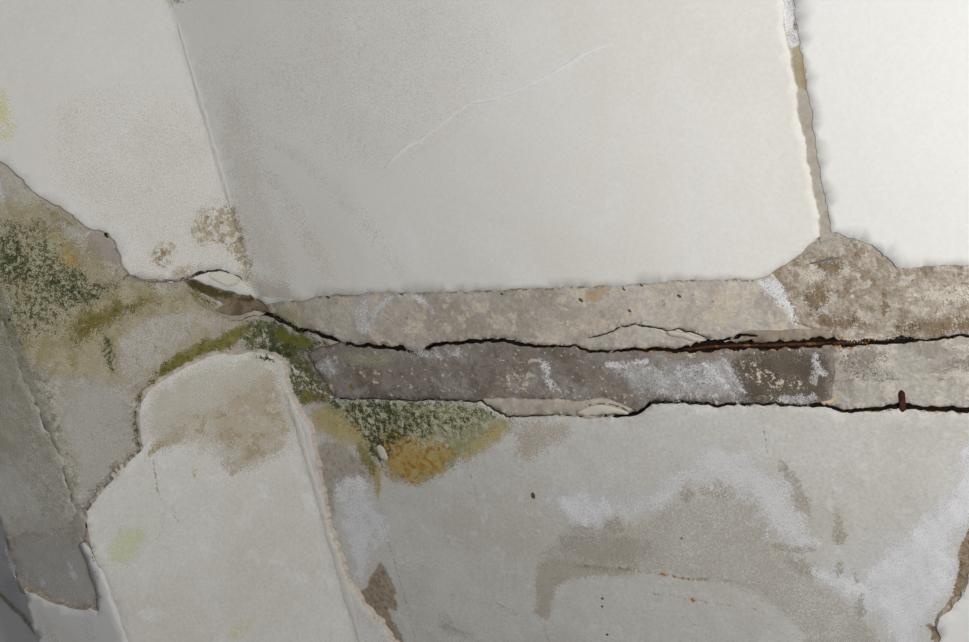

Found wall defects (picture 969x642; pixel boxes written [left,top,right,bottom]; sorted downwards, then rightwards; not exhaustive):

crack [66,269,243,287]
leakage [25,308,304,500]
leakage [316,293,463,378]
leakage [538,357,563,397]
crack [211,310,969,356]
crack [316,396,969,453]
leakage [532,440,969,642]
spalling [912,513,969,642]